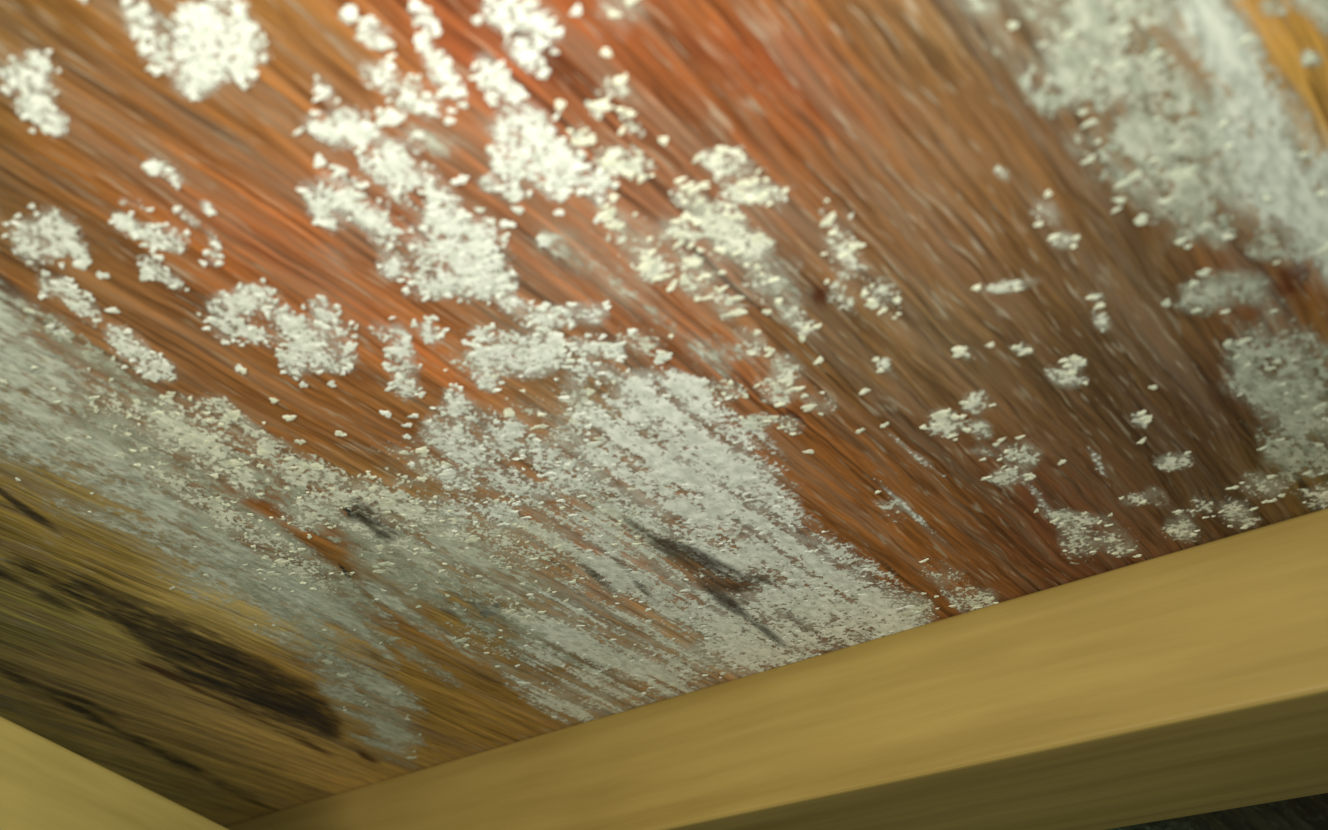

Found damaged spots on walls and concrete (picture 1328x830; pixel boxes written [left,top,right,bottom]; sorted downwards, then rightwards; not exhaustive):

damp [1007,0,1328,292]
damp [972,279,1024,294]
damp [1085,294,1109,332]
damp [1011,342,1033,356]
damp [0,0,999,771]
damp [1044,355,1088,386]
damp [1161,268,1328,543]
damp [919,390,1161,564]
damp [1154,451,1194,472]